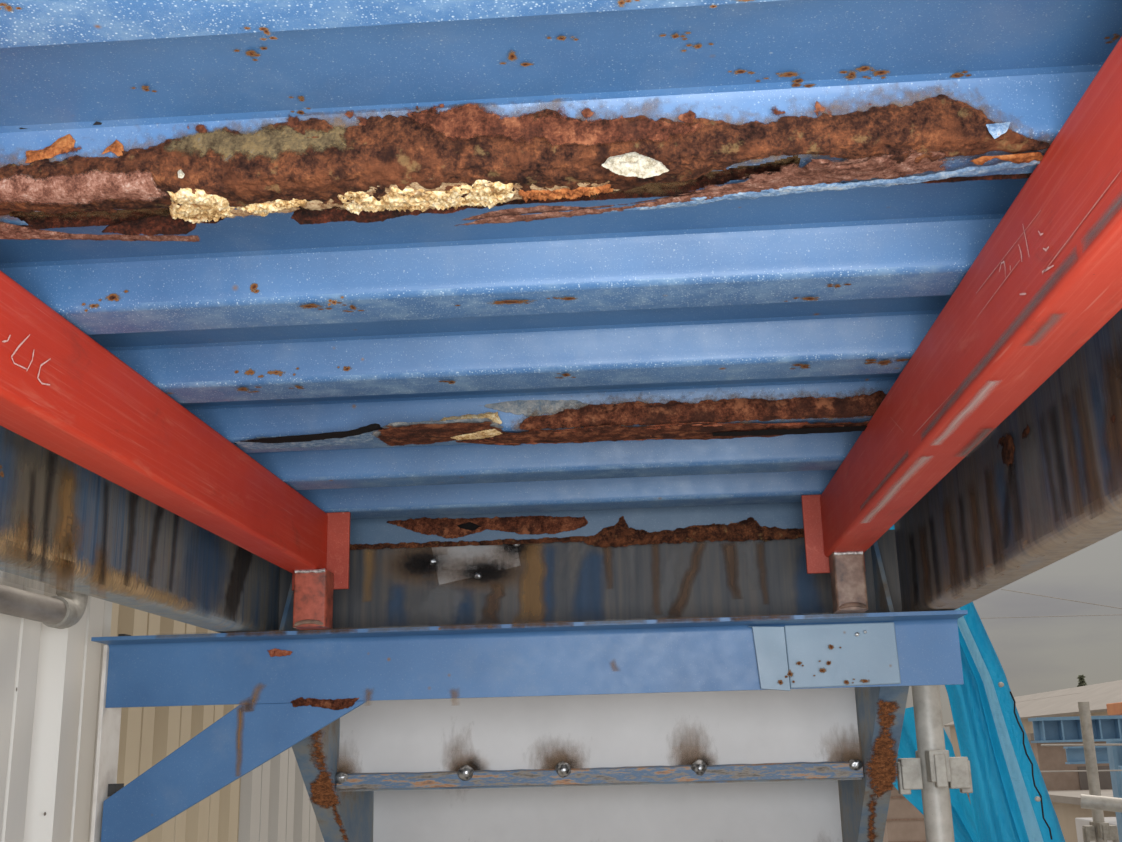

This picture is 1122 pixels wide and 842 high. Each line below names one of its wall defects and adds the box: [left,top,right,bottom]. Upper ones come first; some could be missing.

rust [728,69,815,88]
rust [840,66,890,80]
peeling [102,139,124,156]
rust [0,89,1050,217]
spalling [291,152,1044,225]
rust [514,390,886,430]
water stain [0,443,74,570]
rust [350,516,804,629]
rust [290,692,370,710]
rust [778,644,841,685]
rust [310,730,348,842]
rust [865,700,900,842]